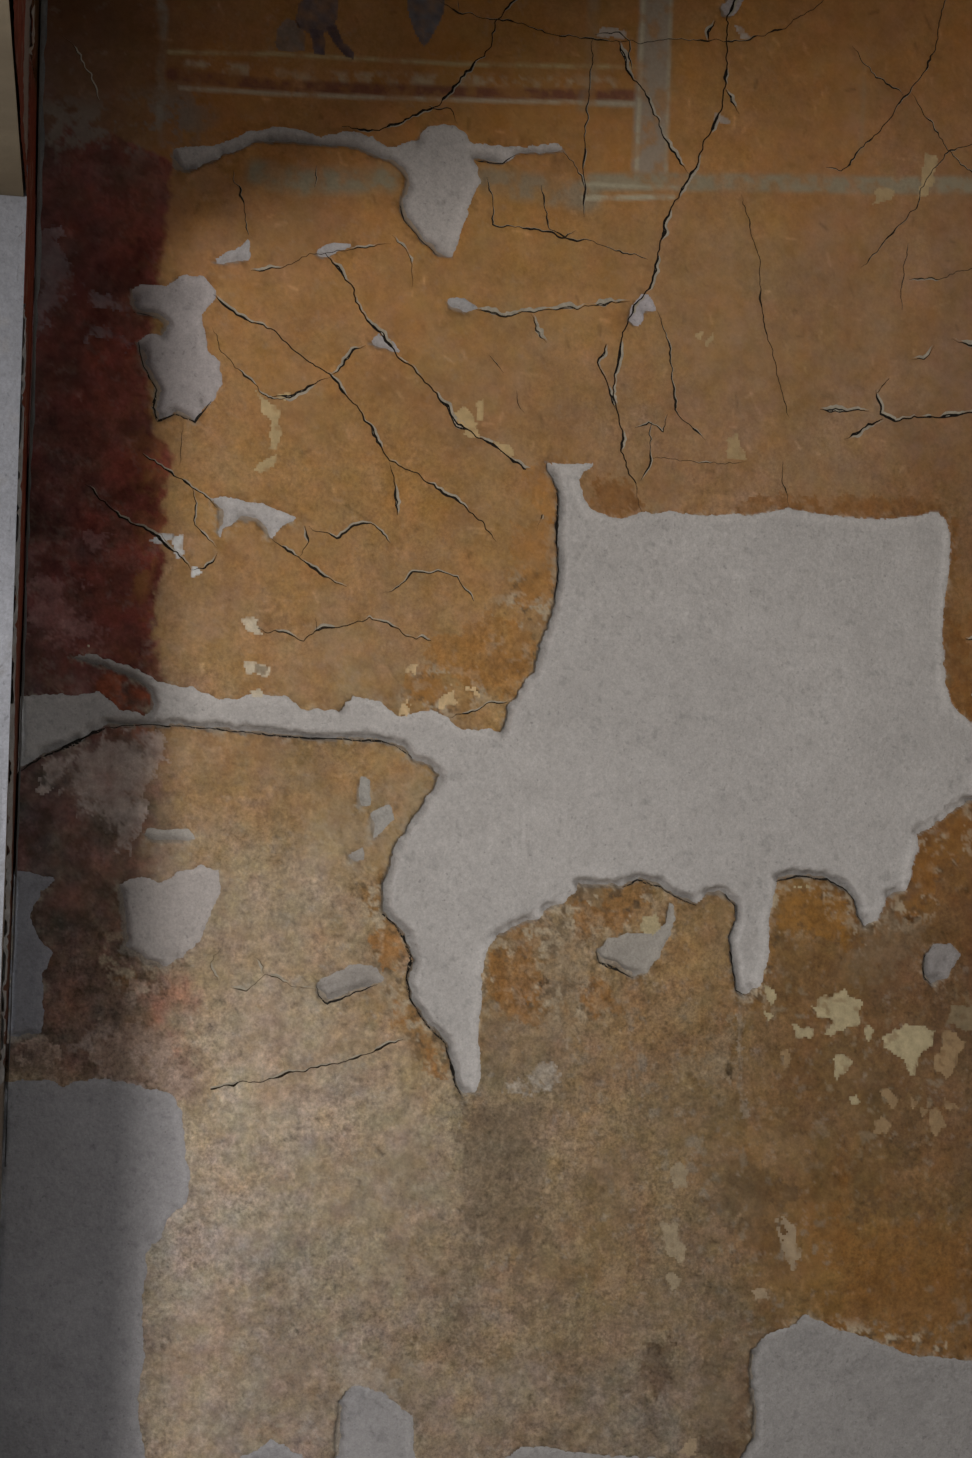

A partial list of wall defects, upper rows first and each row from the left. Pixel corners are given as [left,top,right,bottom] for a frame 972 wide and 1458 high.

crack [826,0,972,309]
crack [342,0,823,512]
crack [742,197,972,439]
crack [212,172,530,641]
crack [85,433,218,570]
peeling [241,616,263,635]
peeling [244,661,270,698]
peeling [438,683,480,710]
crack [210,1038,403,1090]
peeling [780,988,972,1136]
peeling [659,1220,687,1291]
peeling [775,1216,803,1271]